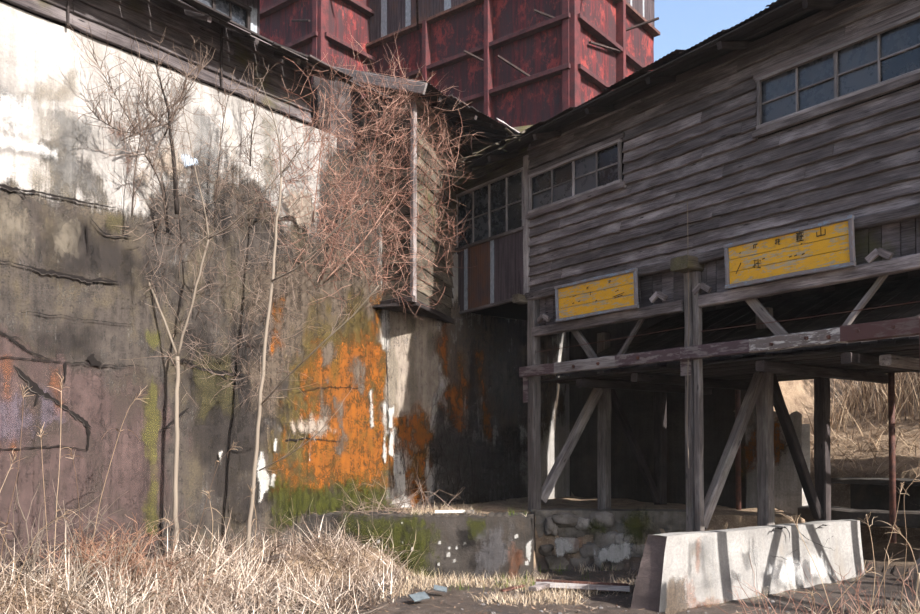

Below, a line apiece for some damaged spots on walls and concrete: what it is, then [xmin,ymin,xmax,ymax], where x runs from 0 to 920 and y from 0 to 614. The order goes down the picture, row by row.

crack [0,184,132,253]
crack [0,260,123,283]
leakage [0,110,528,581]
leakage [540,331,571,364]
crack [0,331,92,451]
leakage [540,375,566,443]
peeling [257,452,276,503]
leakage [554,537,573,556]